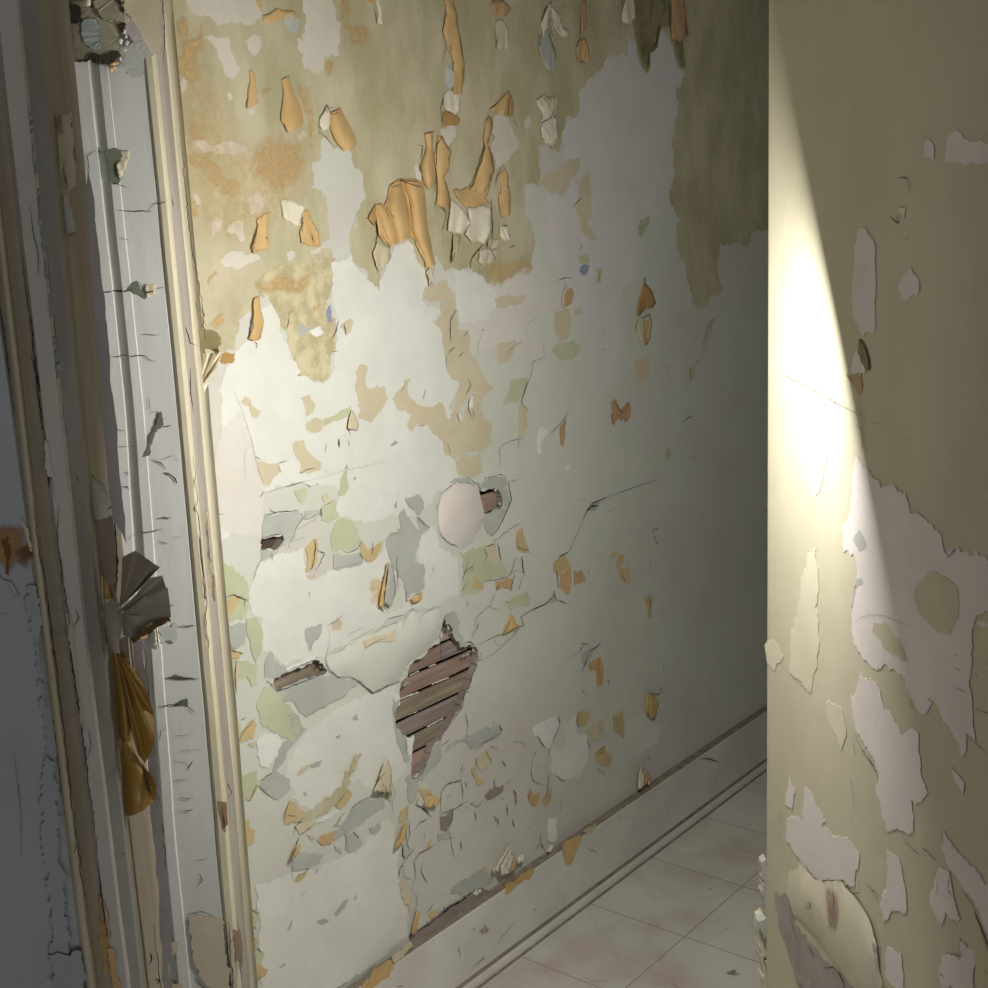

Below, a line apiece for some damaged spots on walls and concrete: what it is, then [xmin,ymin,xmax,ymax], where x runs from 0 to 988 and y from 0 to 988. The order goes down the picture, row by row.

peeling [69,0,769,846]
crack [462,447,695,658]
peeling [765,548,820,694]
peeling [825,456,988,988]
flaking render [754,854,852,988]
peeling [778,776,860,887]